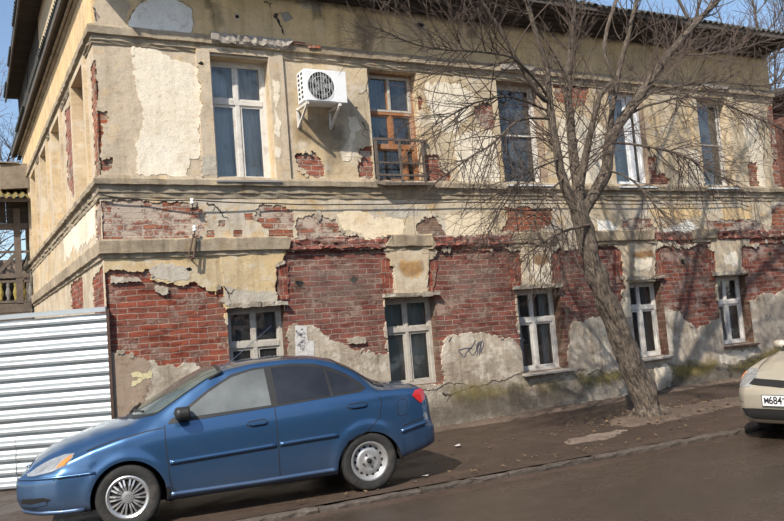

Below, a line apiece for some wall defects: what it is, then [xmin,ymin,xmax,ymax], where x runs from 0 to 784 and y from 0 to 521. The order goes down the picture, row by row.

peeling [130,46,205,176]
flaking render [296,150,324,178]
flaking render [340,105,373,180]
flaking render [71,278,84,309]
flaking render [93,264,230,368]
flaking render [269,228,393,355]
flaking render [423,245,587,409]
flaking render [552,247,600,358]
flaking render [598,245,626,304]
flaking render [657,240,719,329]
flaking render [742,230,784,301]